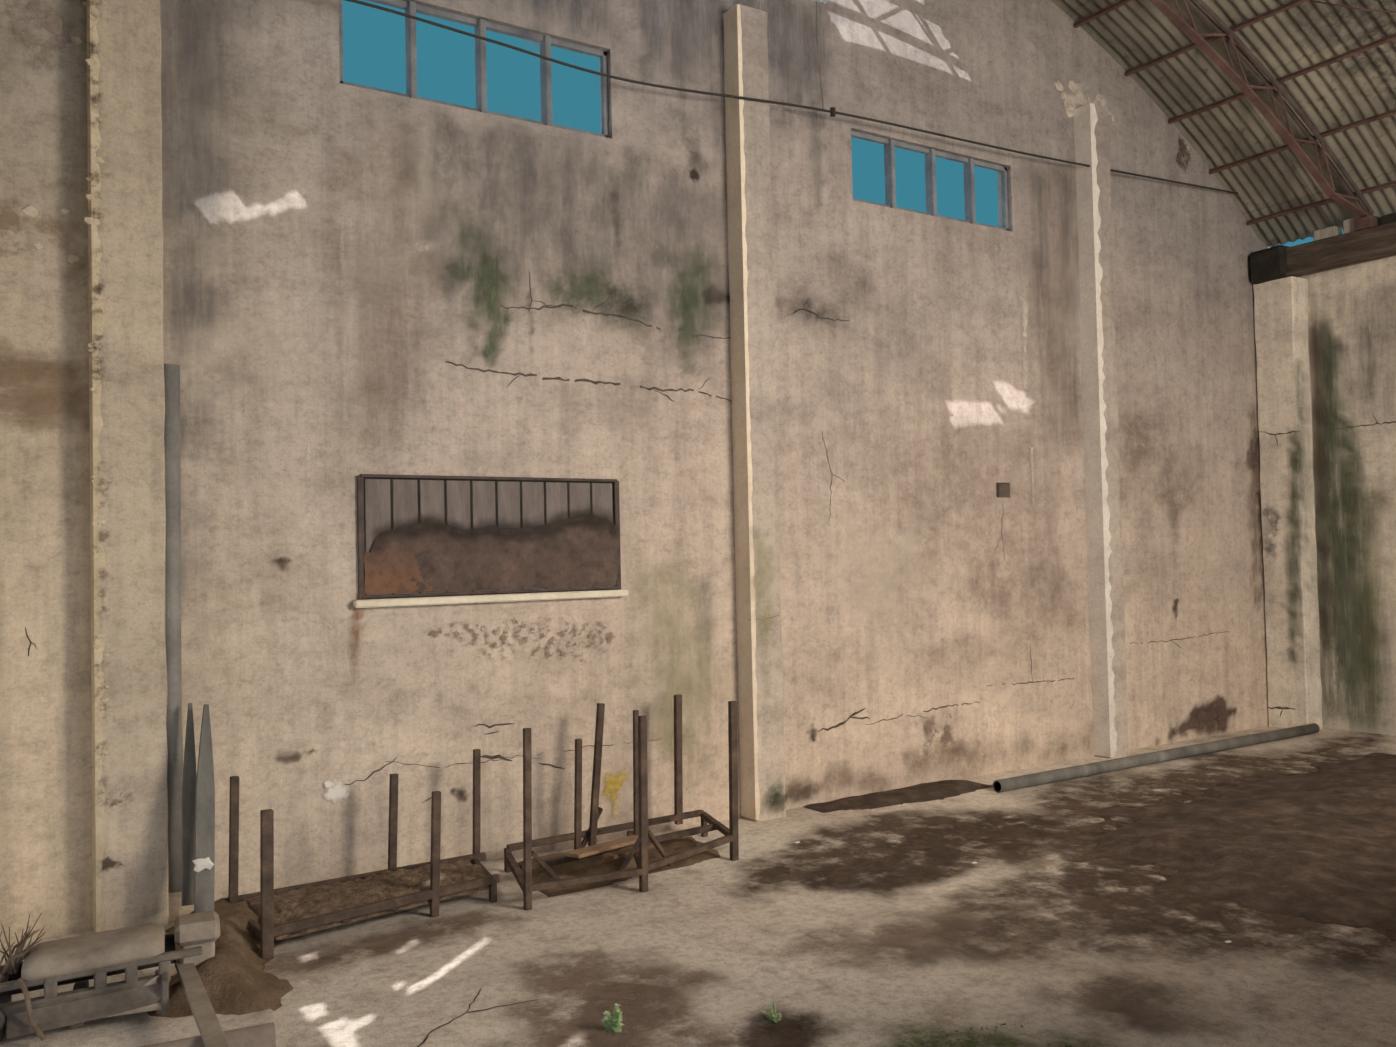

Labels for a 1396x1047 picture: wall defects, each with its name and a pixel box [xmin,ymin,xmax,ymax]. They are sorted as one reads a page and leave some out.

damp [455,263,509,364]
crack [501,271,730,339]
damp [0,359,76,423]
crack [445,361,732,402]
spalling [428,620,616,662]
damp [743,326,1396,970]
crack [818,652,1075,732]